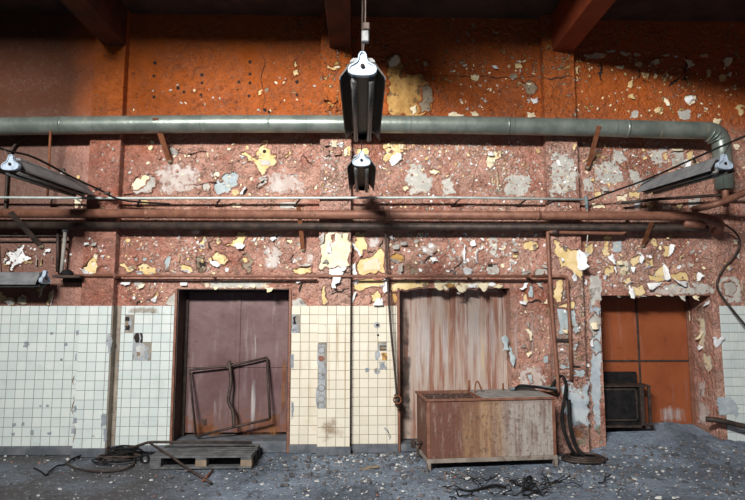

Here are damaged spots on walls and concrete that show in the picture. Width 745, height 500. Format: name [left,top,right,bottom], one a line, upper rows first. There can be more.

peeling [385,53,435,116]
crack [668,56,690,86]
peeling [73,199,85,209]
peeling [122,138,702,211]
peeling [1,231,72,272]
peeling [79,201,745,430]